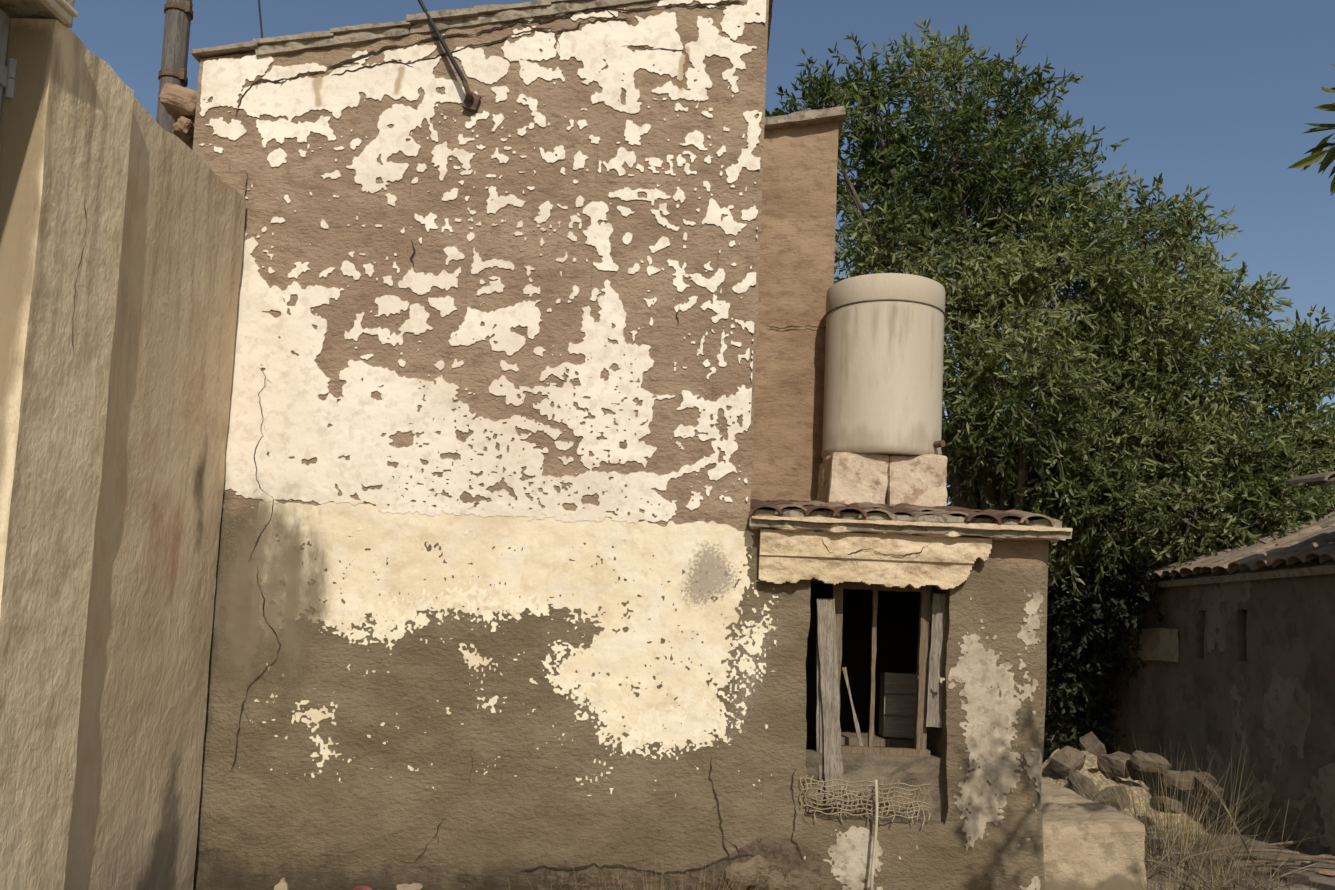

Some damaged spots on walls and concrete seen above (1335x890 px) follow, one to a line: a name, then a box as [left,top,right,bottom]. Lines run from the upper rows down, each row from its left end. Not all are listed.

crack [236,0,743,114]
peeling [199,0,778,796]
crack [231,369,282,769]
leakage [209,502,778,760]
peeling [937,589,1043,851]
crack [520,757,754,883]
spalling [538,826,901,890]
crack [790,770,808,861]
peeling [1018,876,1040,890]